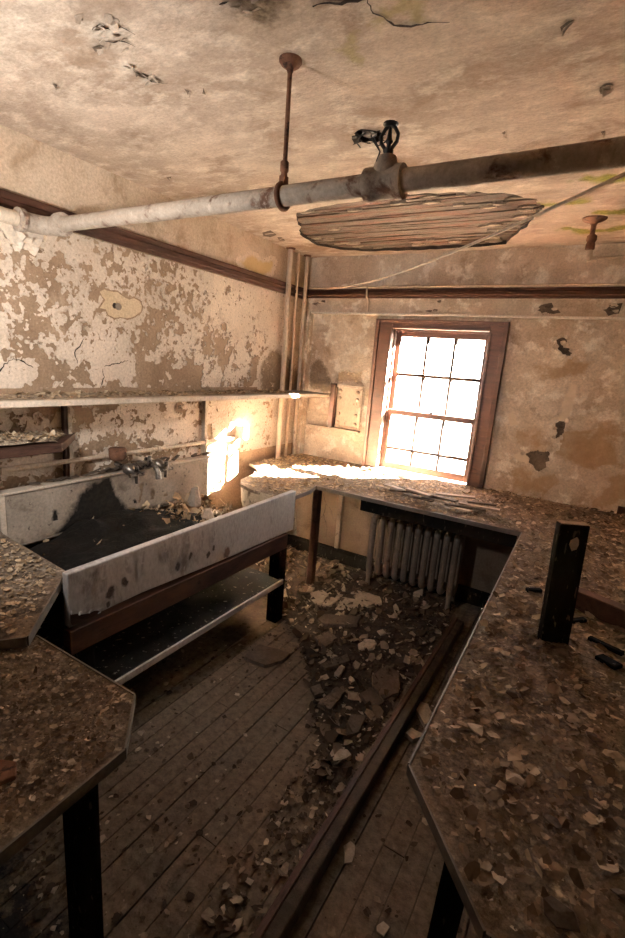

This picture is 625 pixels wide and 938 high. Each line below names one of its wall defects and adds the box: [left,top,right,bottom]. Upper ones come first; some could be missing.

peeling [92,13,135,56]
crack [312,0,450,28]
peeling [123,64,167,86]
spalling [296,205,544,251]
peeling [0,224,625,938]